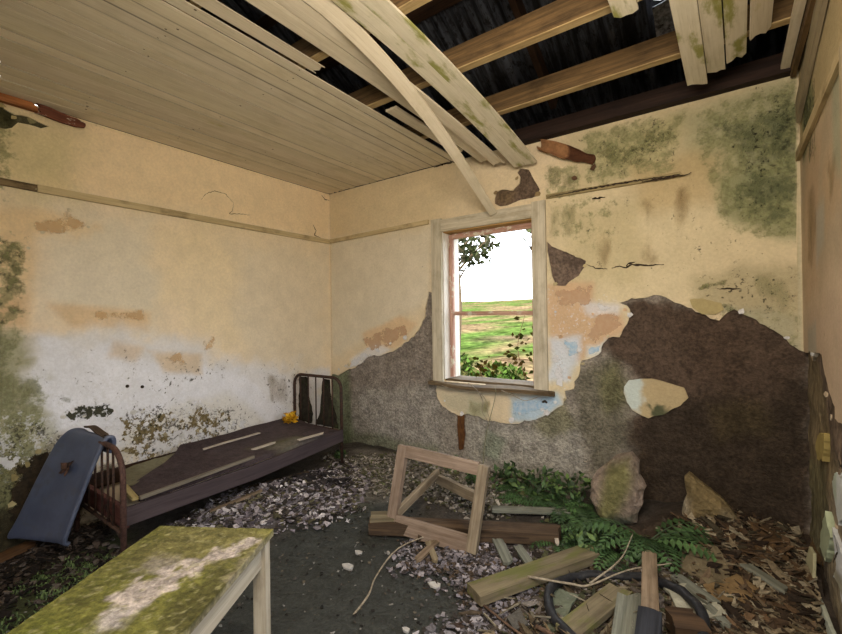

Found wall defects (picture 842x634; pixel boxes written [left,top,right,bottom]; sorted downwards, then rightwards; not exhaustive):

flaking render [537,139,596,170]
leakage [600,130,671,164]
spalling [494,169,541,206]
crack [550,172,691,199]
leakage [0,240,25,291]
spalling [332,243,842,634]
leakage [0,509,38,553]